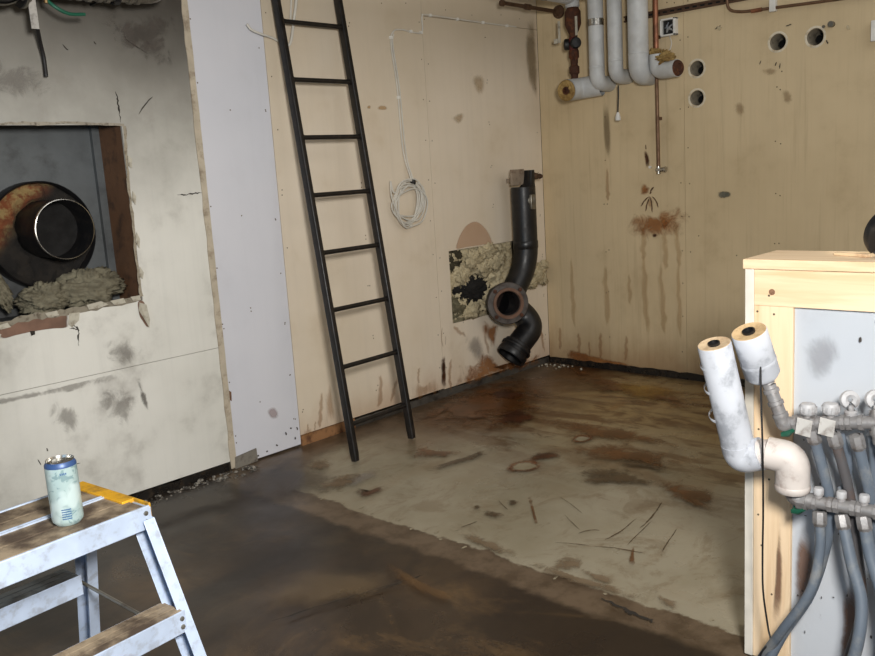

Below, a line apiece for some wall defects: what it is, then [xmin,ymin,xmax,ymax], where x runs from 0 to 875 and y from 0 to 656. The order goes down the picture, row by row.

rust [634,186,676,237]
spalling [452,275,490,305]